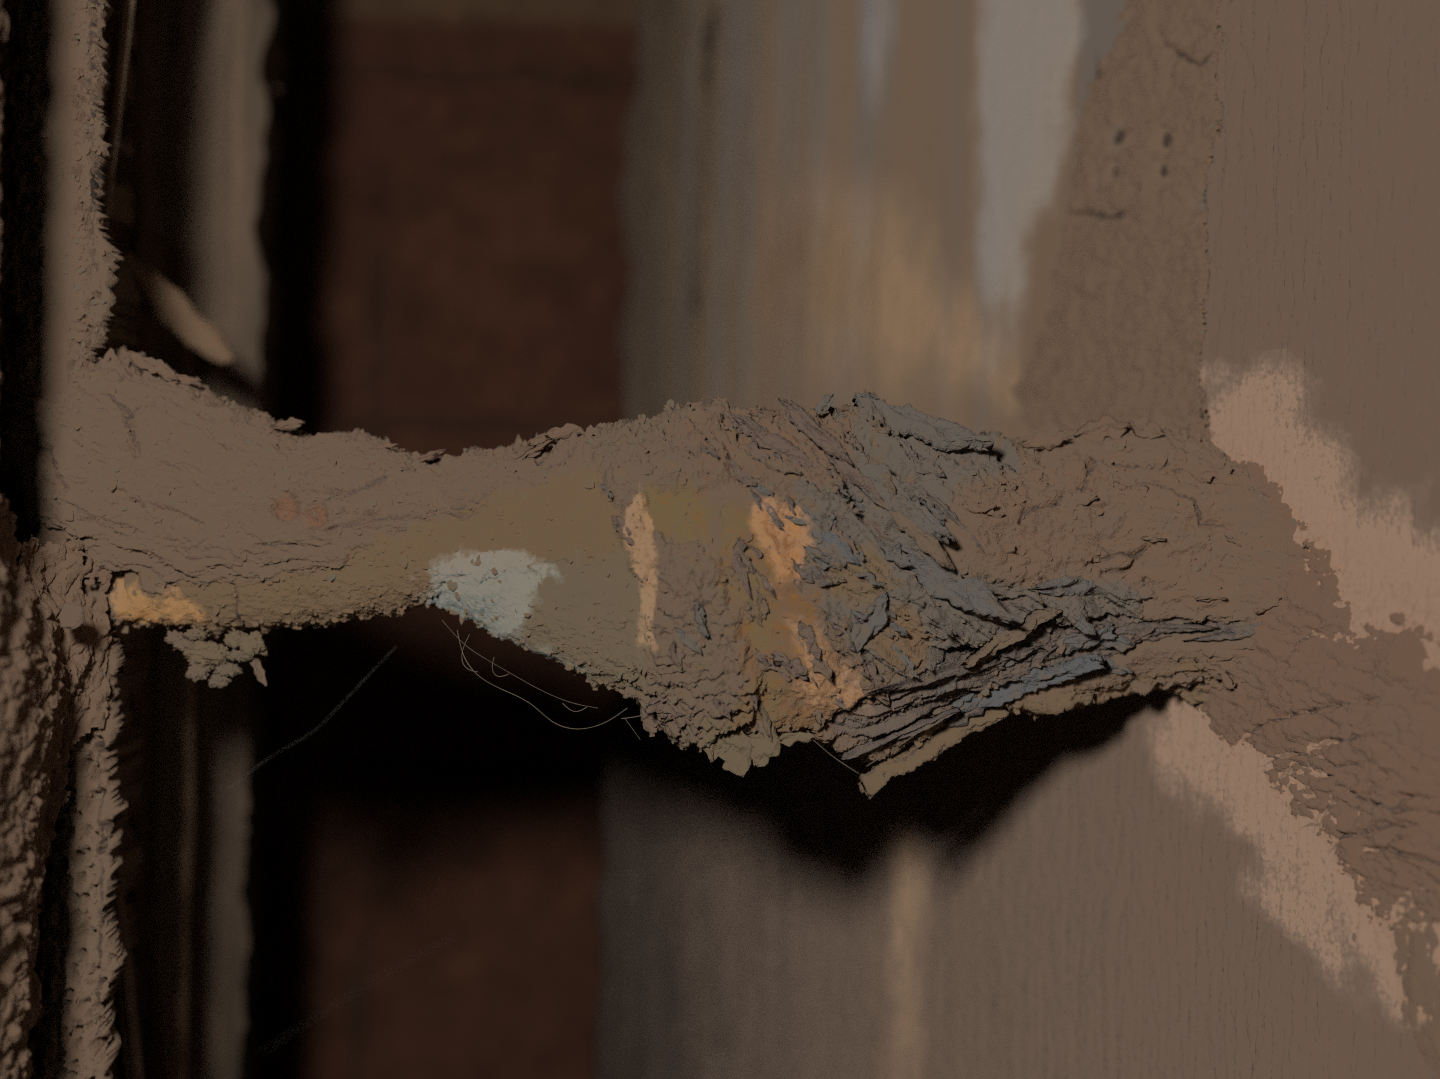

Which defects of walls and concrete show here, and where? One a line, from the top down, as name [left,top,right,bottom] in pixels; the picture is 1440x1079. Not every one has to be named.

crack [96,356,143,456]
crack [329,467,489,531]
peeling [732,537,776,627]
peeling [749,392,1263,760]
peeling [623,684,682,718]